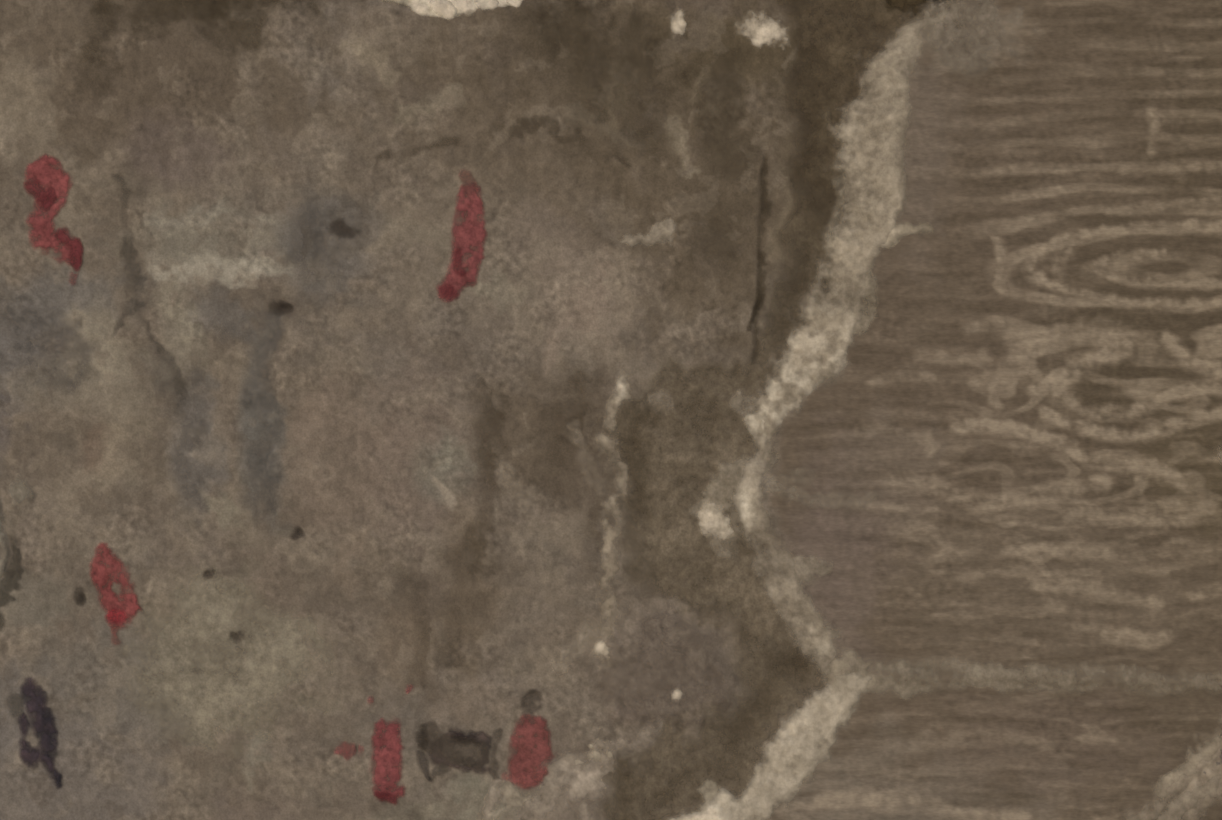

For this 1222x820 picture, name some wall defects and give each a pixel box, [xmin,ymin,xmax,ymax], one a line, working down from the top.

crack [1126,718,1222,820]